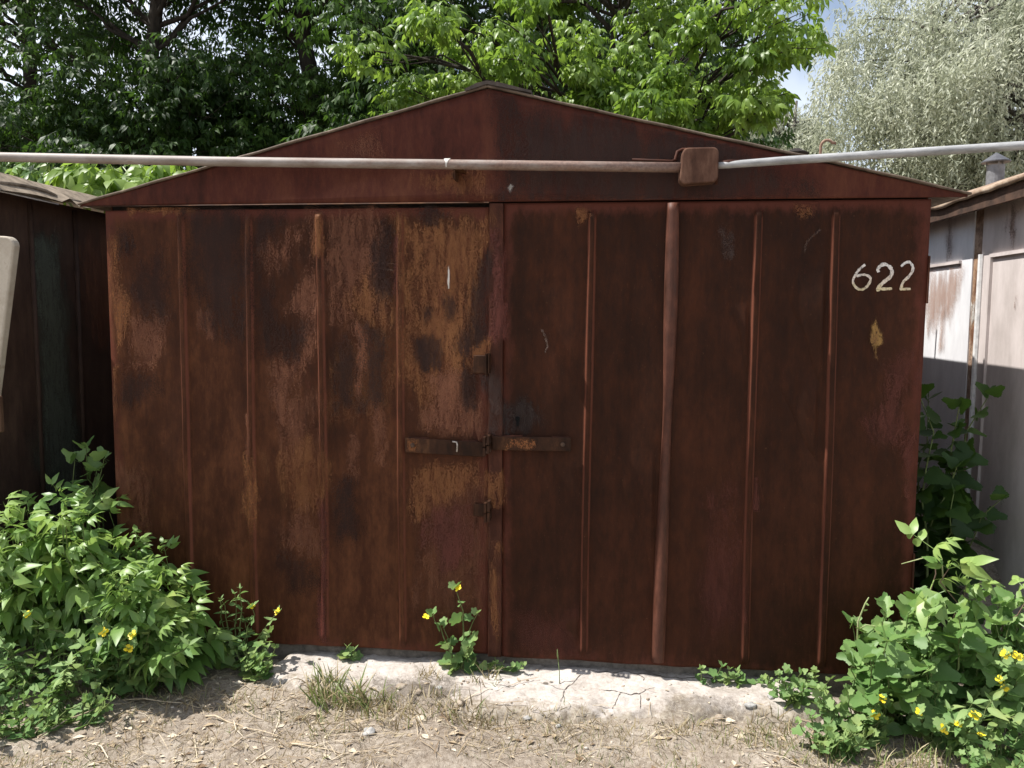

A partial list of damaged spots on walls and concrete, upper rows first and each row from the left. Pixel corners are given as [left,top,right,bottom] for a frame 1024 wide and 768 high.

corrosion [107,236,169,370]
corrosion [256,205,509,467]
corrosion [870,320,883,346]
corrosion [240,414,261,532]
corrosion [408,460,507,523]
corrosion [505,438,536,451]
crack [540,670,732,709]